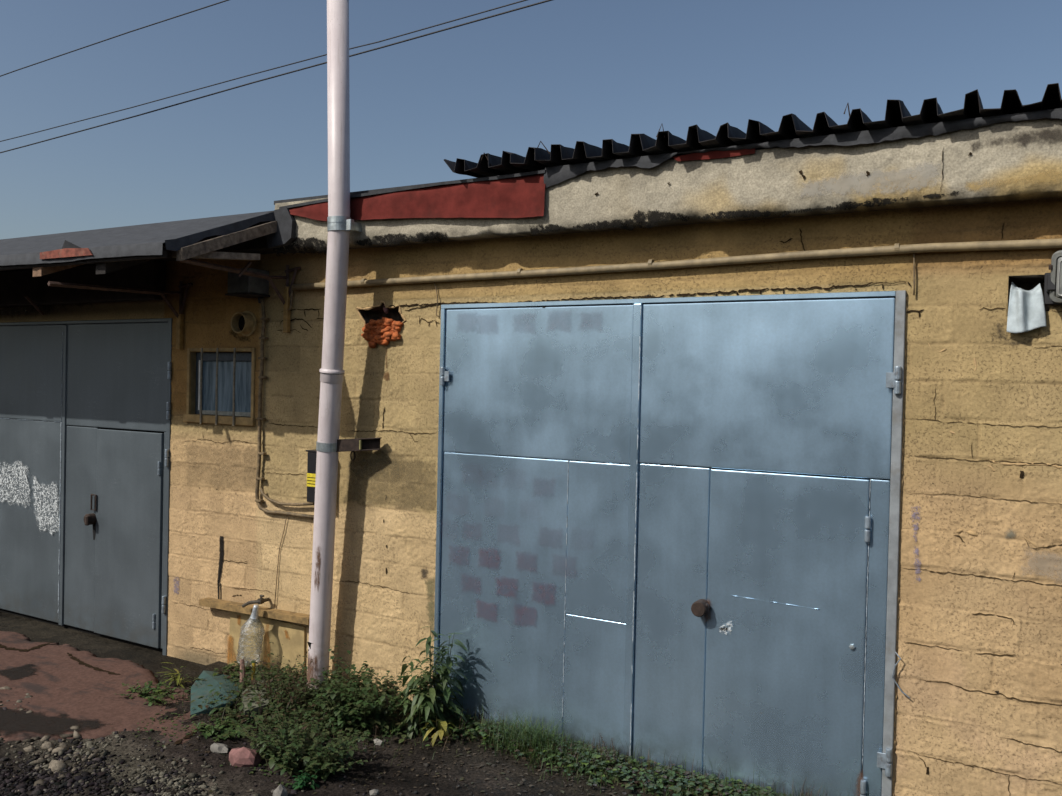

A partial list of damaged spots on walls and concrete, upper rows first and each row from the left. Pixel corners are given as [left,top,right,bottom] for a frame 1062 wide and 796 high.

leakage [972,129,1062,151]
leakage [529,197,909,236]
leakage [273,237,327,256]
leakage [356,231,449,247]
spalling [356,301,407,348]
crack [905,391,1062,466]
crack [900,567,1062,586]
crack [973,613,1014,625]
crack [907,642,1013,656]
crack [919,679,1060,705]
crack [1007,738,1062,753]
crack [911,751,1061,796]